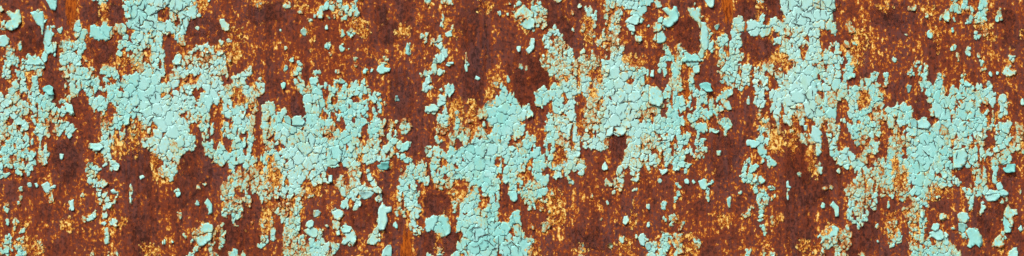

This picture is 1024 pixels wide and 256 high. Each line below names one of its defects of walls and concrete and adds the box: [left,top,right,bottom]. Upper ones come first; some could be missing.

crack [116,0,197,122]
corrosion [393,23,412,38]
crack [774,0,842,119]
corrosion [110,126,163,184]
peeling [0,0,454,256]
corrosion [447,77,501,129]
crack [452,134,533,256]
crack [608,81,653,151]
peeling [425,0,1024,256]
corrosion [765,126,819,180]
corrosion [889,154,909,196]
crack [917,104,969,173]